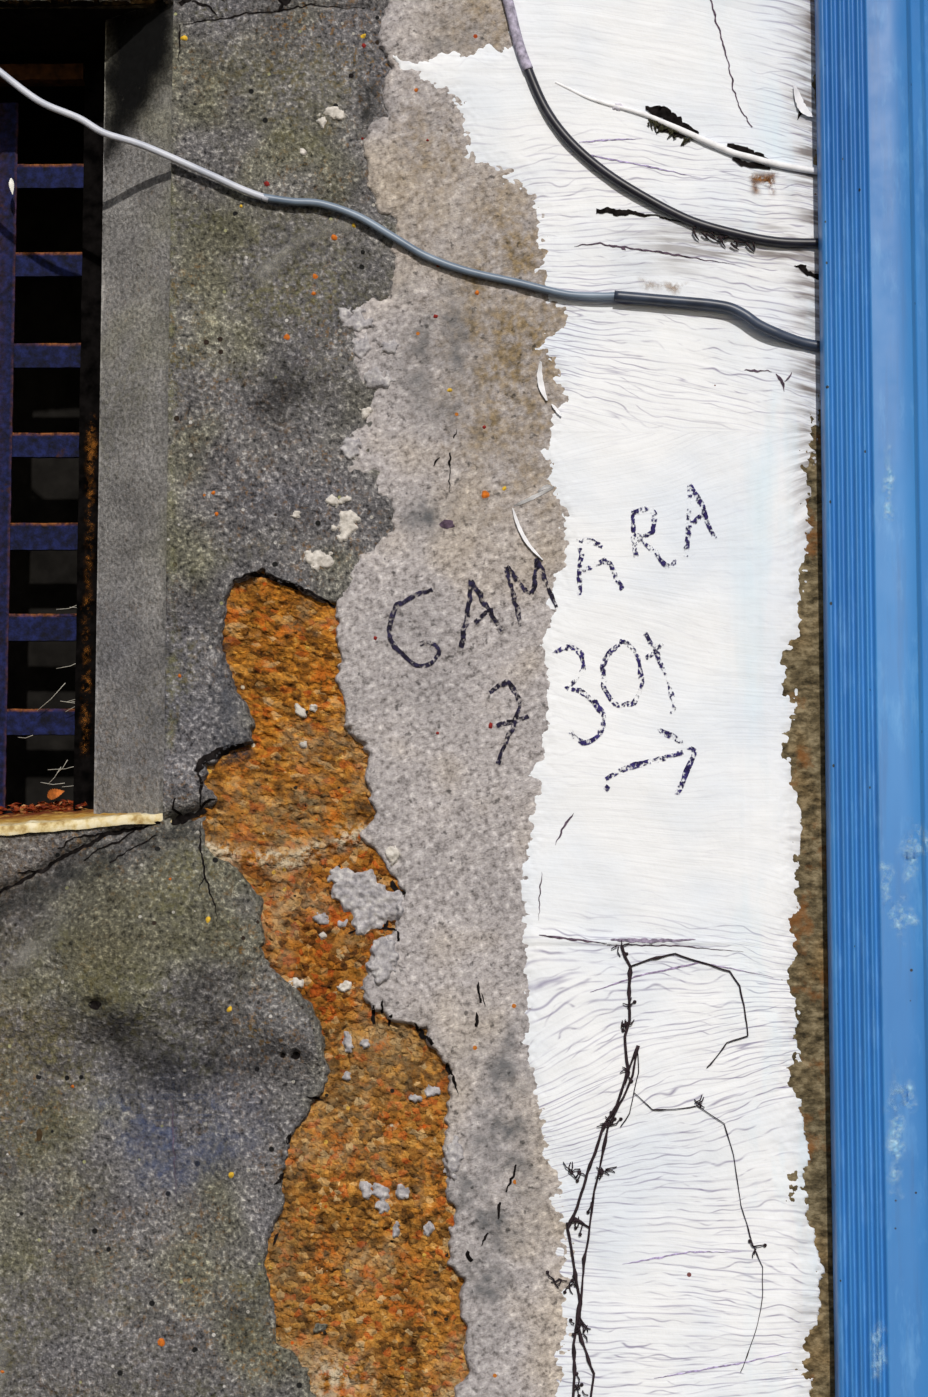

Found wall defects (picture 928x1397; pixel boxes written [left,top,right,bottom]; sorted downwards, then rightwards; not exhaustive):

crack [0,743,244,926]
spalling [192,571,469,1397]